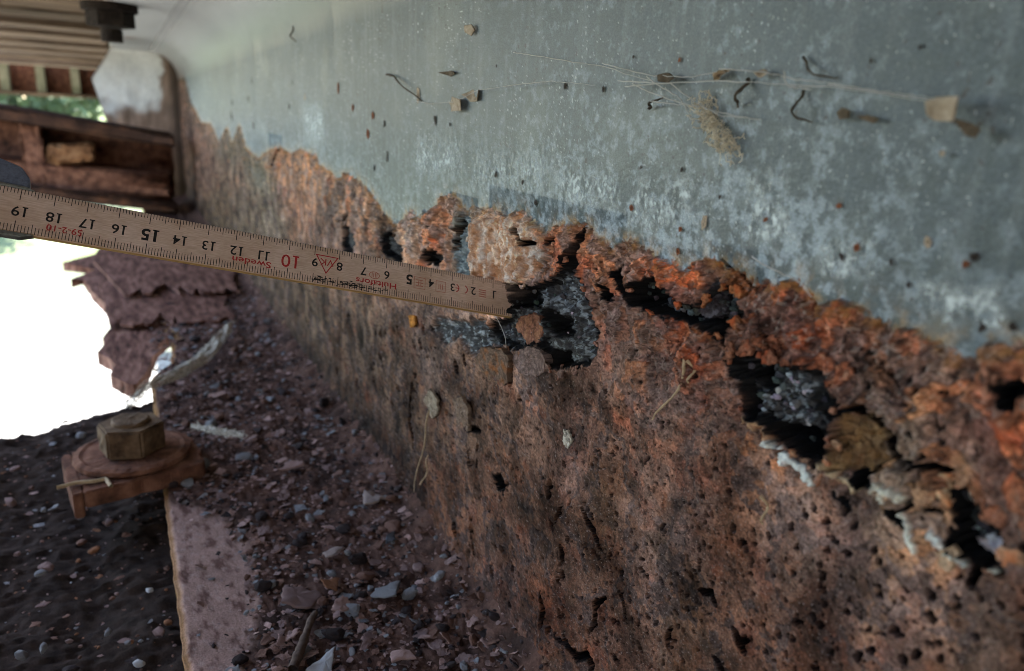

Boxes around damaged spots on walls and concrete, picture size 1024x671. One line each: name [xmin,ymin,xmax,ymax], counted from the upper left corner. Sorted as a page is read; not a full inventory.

spalling [454,214,471,275]
rust [585,223,713,281]
peeling [700,277,745,308]
spalling [434,316,512,358]
rust [475,312,553,389]
rust [754,278,1024,369]
rust [562,429,574,449]
spalling [788,406,894,487]
peeling [936,544,963,572]
peeling [994,546,1024,567]
rust [306,646,336,671]
rust [390,649,416,663]